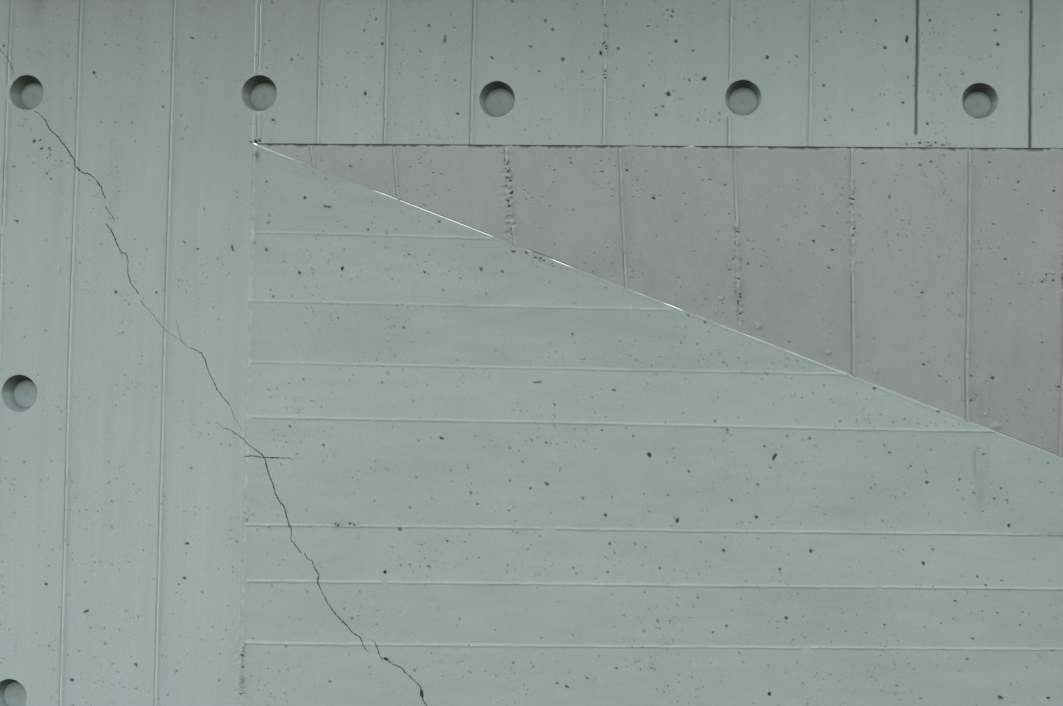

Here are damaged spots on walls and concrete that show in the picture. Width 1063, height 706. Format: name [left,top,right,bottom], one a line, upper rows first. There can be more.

crack [35,111,427,706]